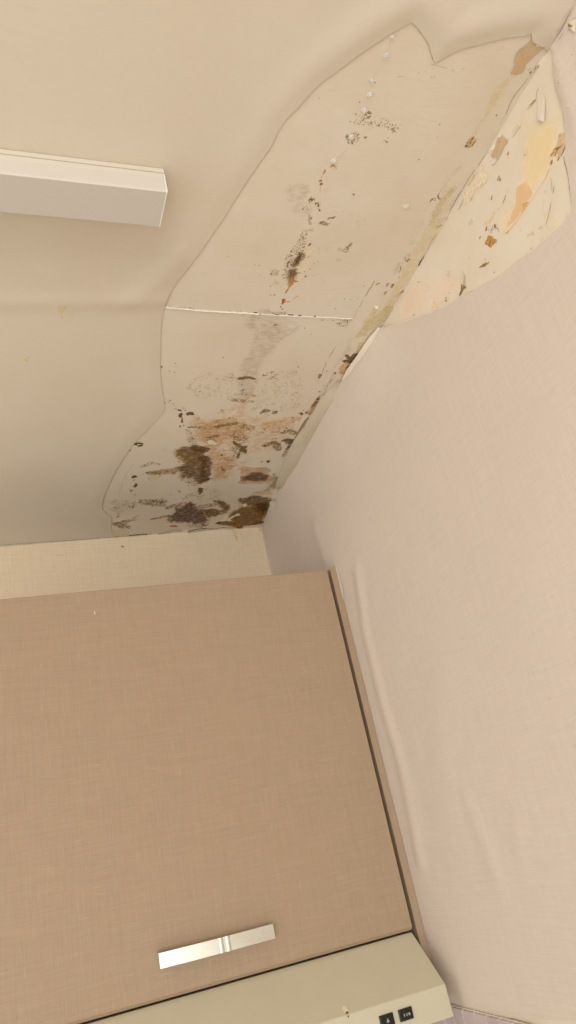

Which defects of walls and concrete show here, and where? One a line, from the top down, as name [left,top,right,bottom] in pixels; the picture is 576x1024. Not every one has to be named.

peeling [511,37,544,75]
peeling [489,134,508,165]
damp [255,197,336,296]
damp [144,353,358,486]
damp [113,477,277,529]